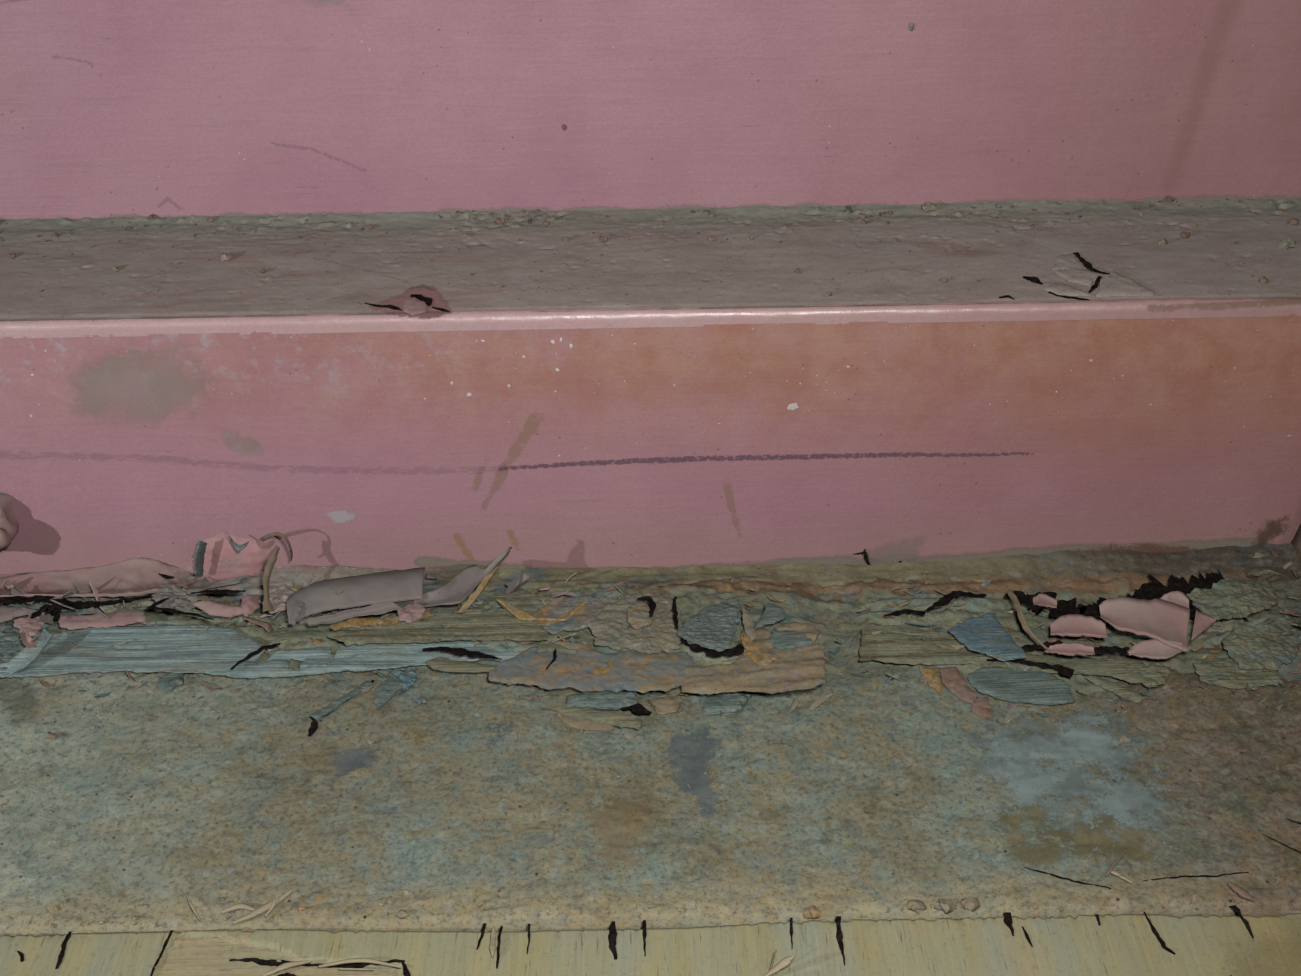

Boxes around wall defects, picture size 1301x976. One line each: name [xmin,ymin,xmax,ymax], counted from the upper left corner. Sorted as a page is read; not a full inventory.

peeling [286,546,512,631]
peeling [192,594,259,617]
spalling [884,591,987,616]
peeling [13,610,147,636]
peeling [987,569,1224,677]